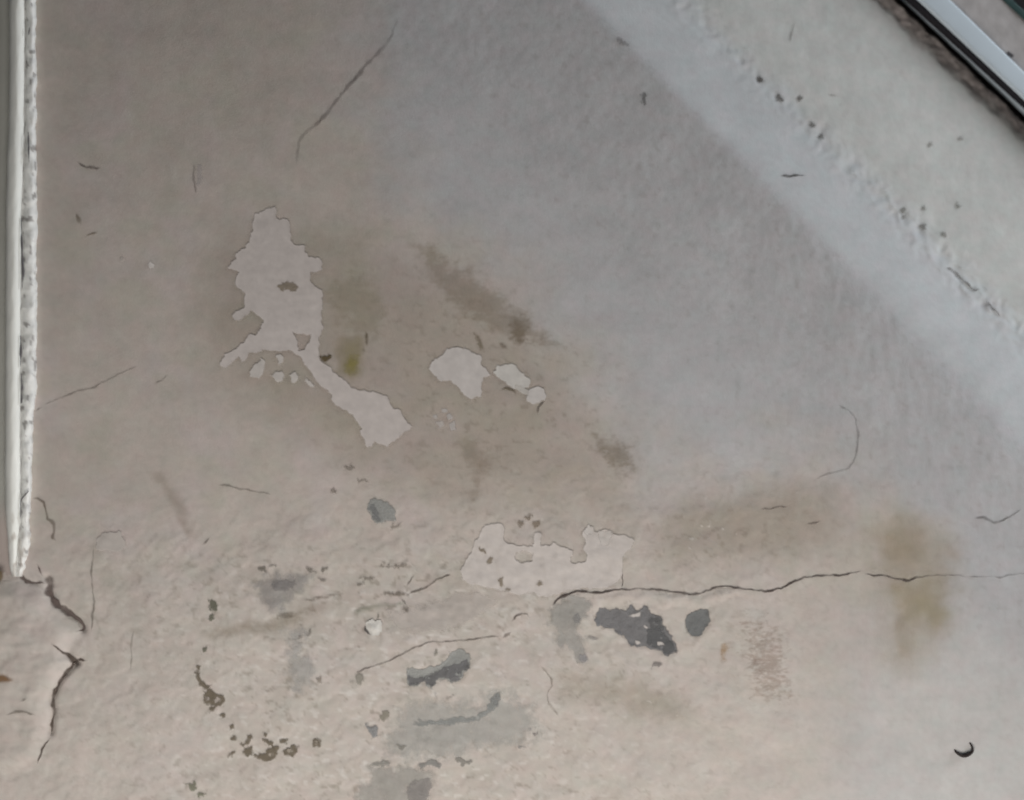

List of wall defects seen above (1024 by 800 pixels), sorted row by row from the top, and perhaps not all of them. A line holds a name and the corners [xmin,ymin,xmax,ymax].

peeling [220,207,412,447]
peeling [429,347,546,412]
crack [17,566,94,761]
crack [361,636,495,671]
flaking render [407,649,470,696]
peeling [461,516,677,667]
flaking render [685,609,711,636]
crack [554,571,925,604]